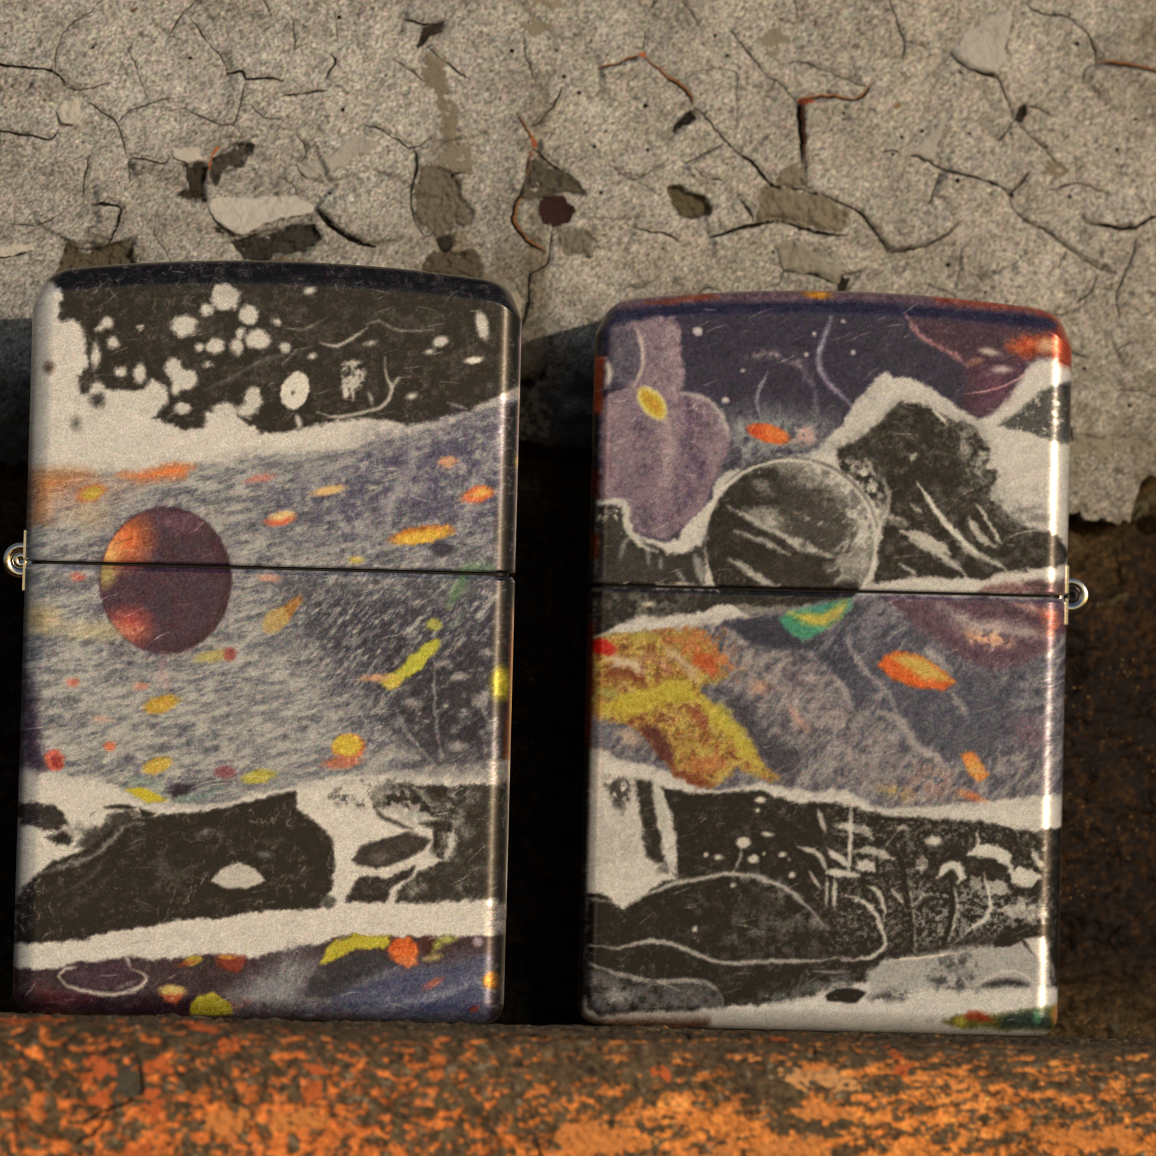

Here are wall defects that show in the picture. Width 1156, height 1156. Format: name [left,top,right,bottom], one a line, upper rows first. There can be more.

crack [0,0,377,259]
peeling [171,147,320,262]
crack [363,124,432,237]
crack [393,17,471,82]
peeling [414,168,481,278]
crack [450,37,577,328]
peeling [521,159,587,200]
peeling [556,226,593,259]
rust [598,52,695,105]
rust [796,81,873,165]
crack [591,0,1156,350]
crack [1070,426,1107,442]